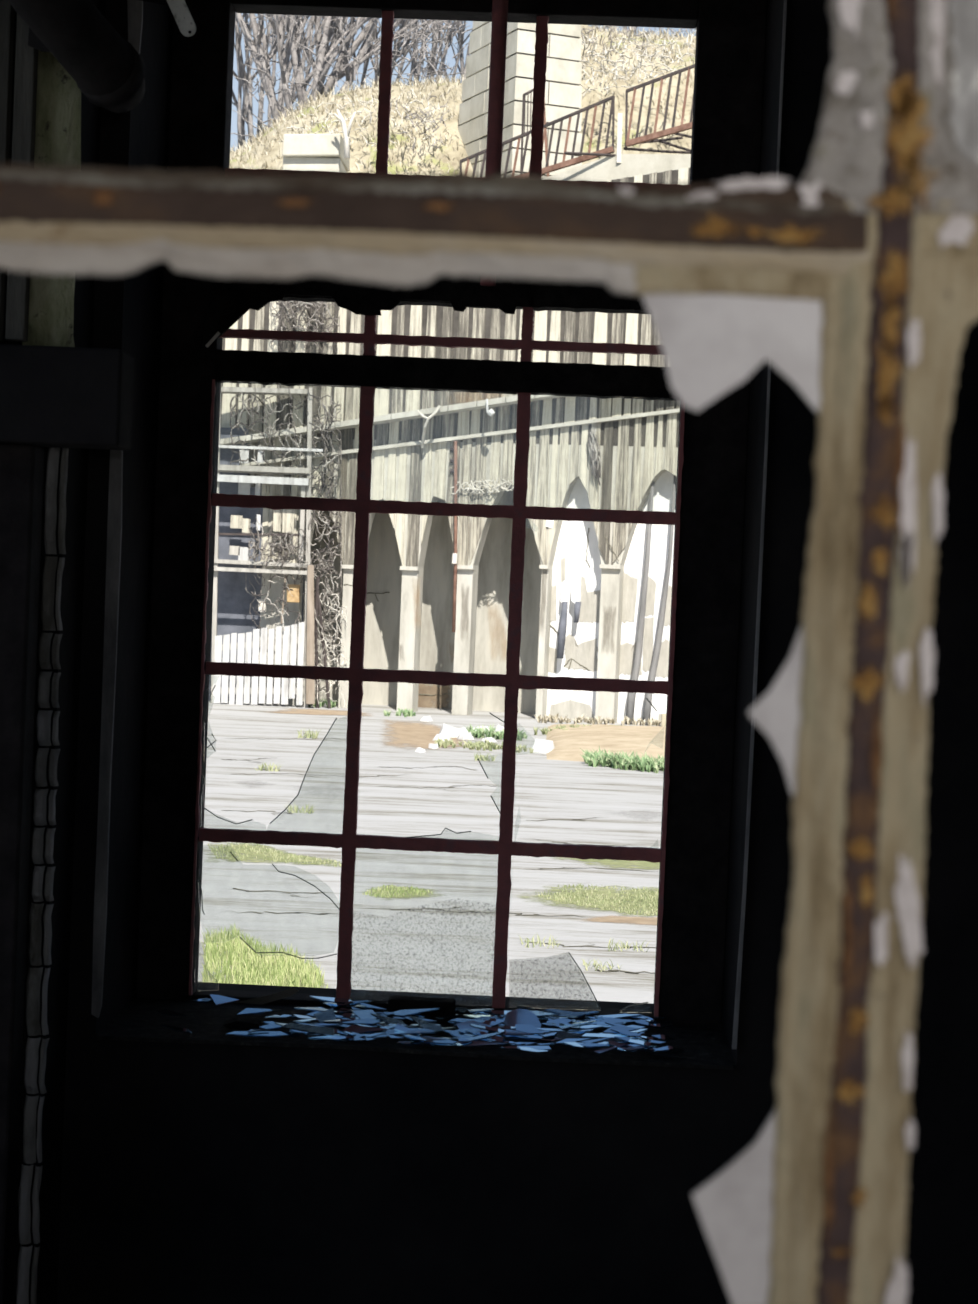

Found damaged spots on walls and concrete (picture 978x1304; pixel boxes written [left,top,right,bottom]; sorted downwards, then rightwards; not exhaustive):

peeling [833,70,858,96]
peeling [838,0,862,38]
peeling [929,0,946,88]
rust [692,214,821,244]
peeling [938,214,976,247]
rust [872,249,908,532]
rust [857,547,889,618]
rust [852,667,884,806]
crack [204,718,520,959]
crack [528,817,659,872]
rust [843,835,876,989]
crack [378,905,656,1011]